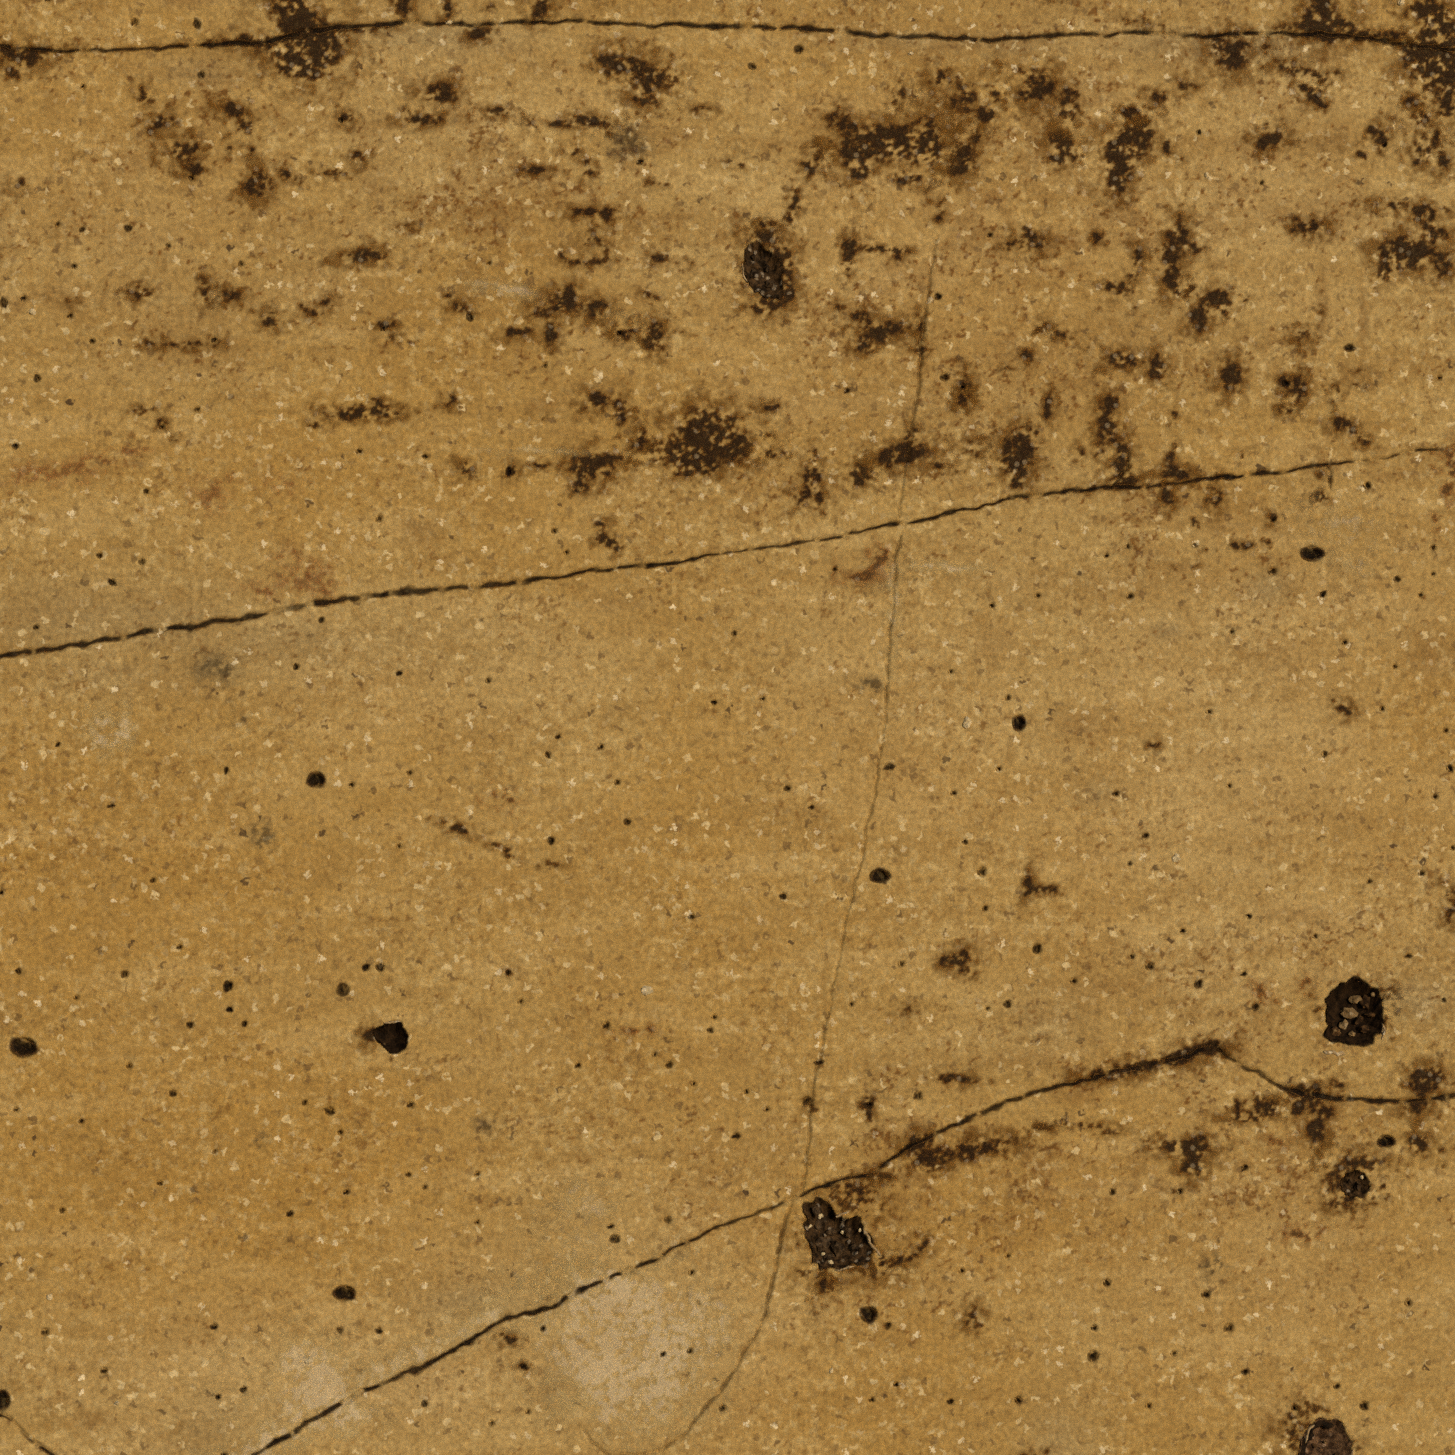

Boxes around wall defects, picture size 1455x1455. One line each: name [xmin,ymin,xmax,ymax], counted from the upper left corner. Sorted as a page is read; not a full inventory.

water stain [178,0,416,93]
crack [0,18,1455,52]
water stain [1201,0,1455,178]
water stain [753,59,1200,228]
spalling [734,222,801,322]
water stain [503,388,787,498]
crack [0,448,1439,658]
hole [1310,976,1394,1056]
hole [795,1181,886,1283]
crack [252,1046,1455,1455]
crack [0,1414,55,1455]
spalling [1272,1401,1362,1455]